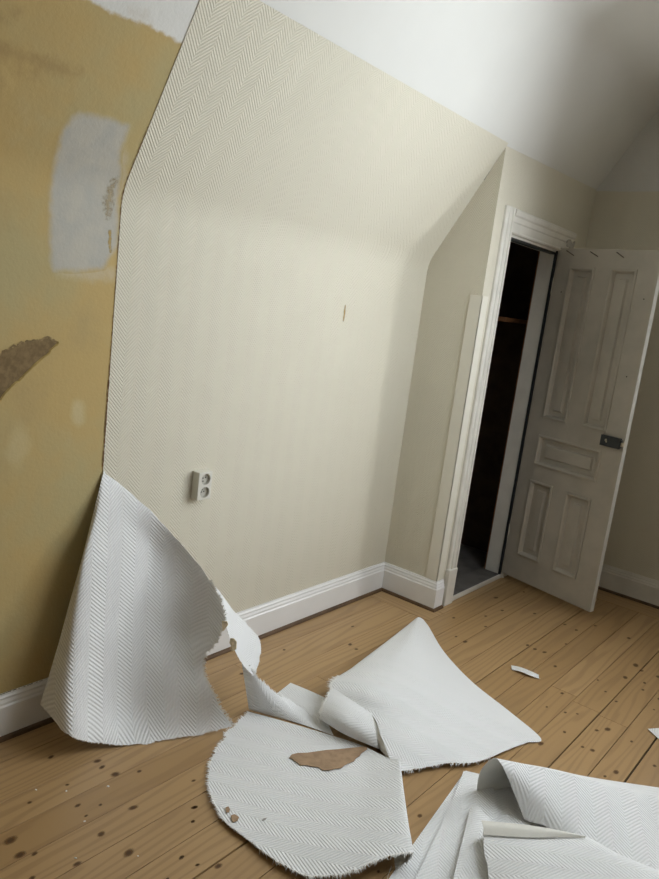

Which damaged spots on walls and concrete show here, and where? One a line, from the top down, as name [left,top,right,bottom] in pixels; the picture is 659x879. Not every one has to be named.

peeling [0,336,59,402]